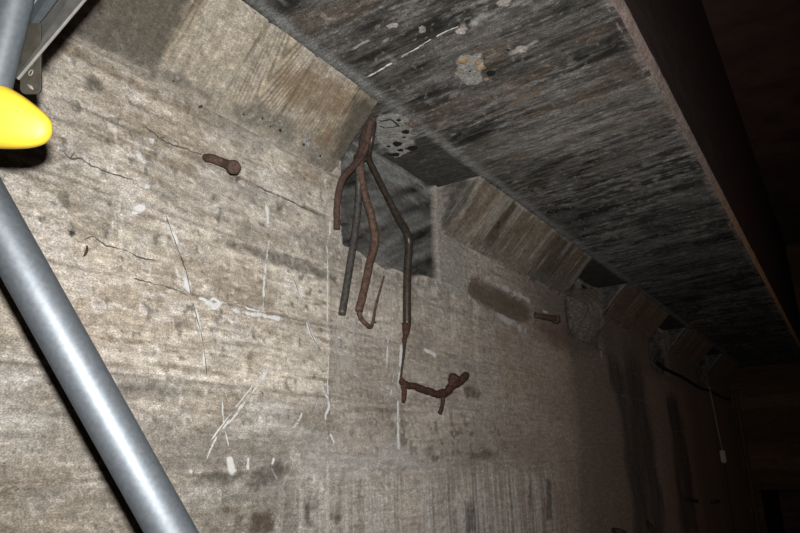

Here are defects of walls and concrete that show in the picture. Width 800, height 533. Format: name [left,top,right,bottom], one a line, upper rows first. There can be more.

spalling [454,53,496,86]
crack [147,128,202,155]
spalling [375,113,421,158]
crack [57,146,131,179]
crack [256,185,317,214]
crack [86,236,153,260]
corrosion [399,339,470,414]